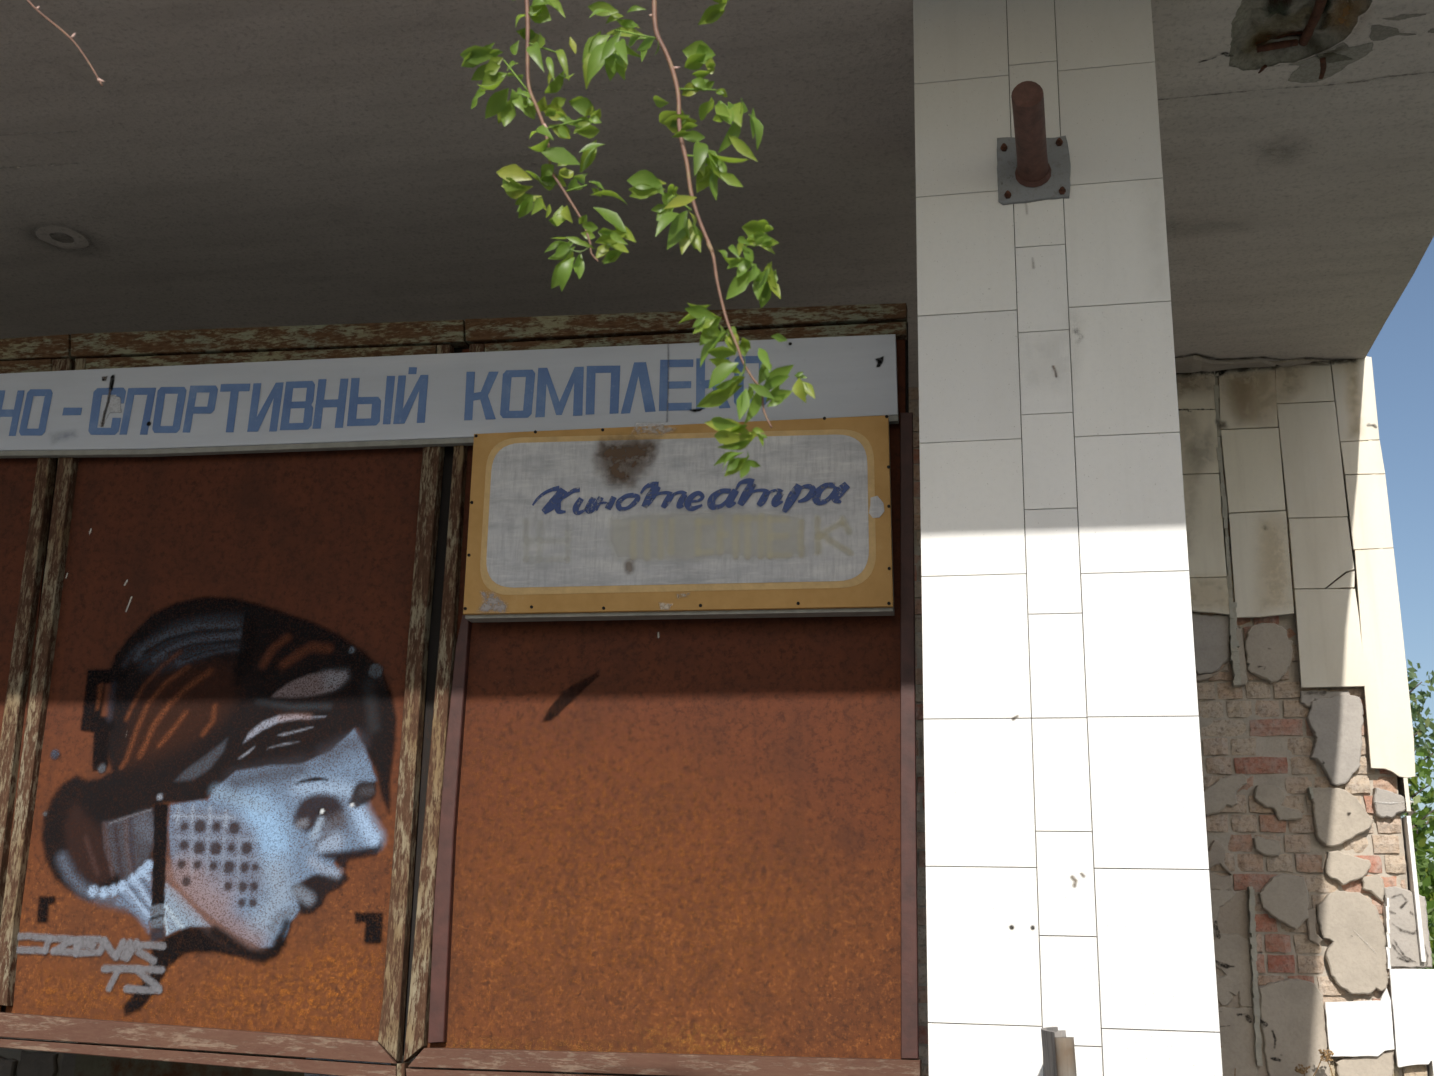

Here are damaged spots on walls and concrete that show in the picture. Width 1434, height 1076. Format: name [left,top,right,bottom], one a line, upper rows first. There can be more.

spalling [1229,0,1434,83]
rust [0,447,423,1041]
rust [425,339,906,1059]
spalling [1354,548,1415,778]
spalling [1324,969,1434,1068]